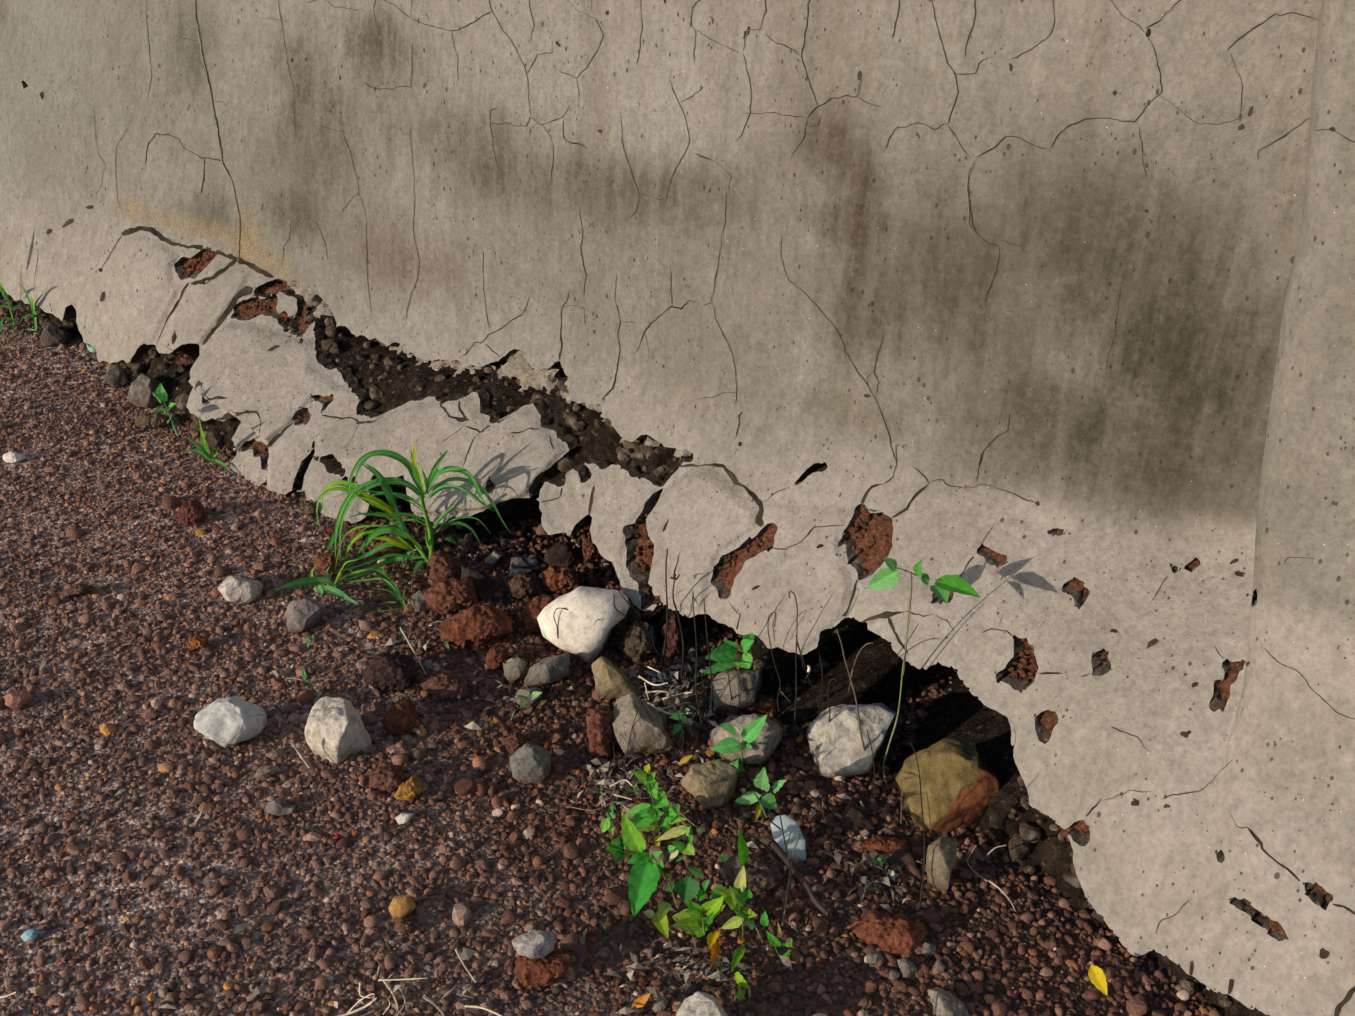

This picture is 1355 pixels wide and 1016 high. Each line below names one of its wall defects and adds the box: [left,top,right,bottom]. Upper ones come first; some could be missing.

crack [93,0,1319,558]
spalling [389,344,660,447]
flaking render [623,476,667,616]
flaking render [711,523,778,600]
flaking render [838,504,893,580]
crack [842,580,1013,654]
flaking render [995,635,1038,693]
crack [1038,670,1090,678]
crack [1266,650,1354,719]
crack [1086,761,1231,817]
crack [1230,814,1300,881]
flaking render [1229,897,1289,941]